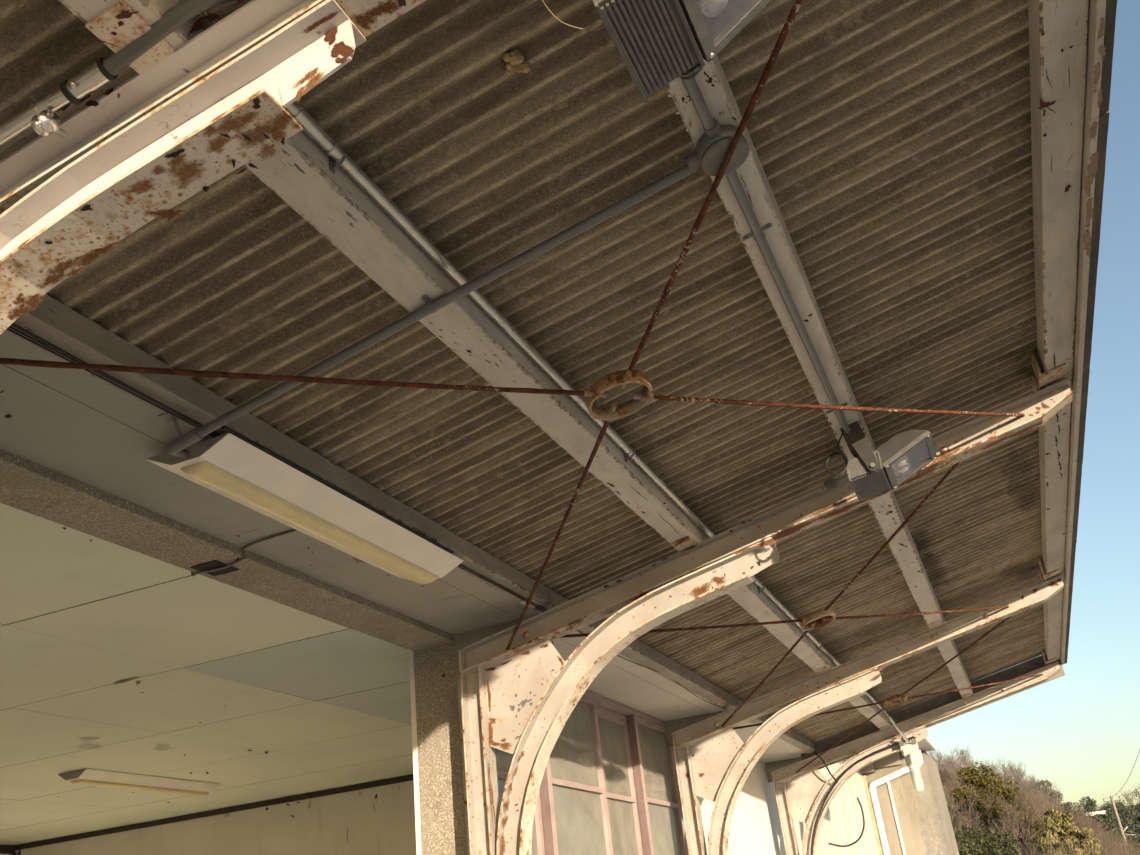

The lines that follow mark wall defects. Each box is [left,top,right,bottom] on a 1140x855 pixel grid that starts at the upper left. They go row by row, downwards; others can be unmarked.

corrosion [302,1,401,33]
corrosion [295,67,324,100]
corrosion [121,111,294,194]
corrosion [150,209,185,221]
corrosion [8,241,126,320]